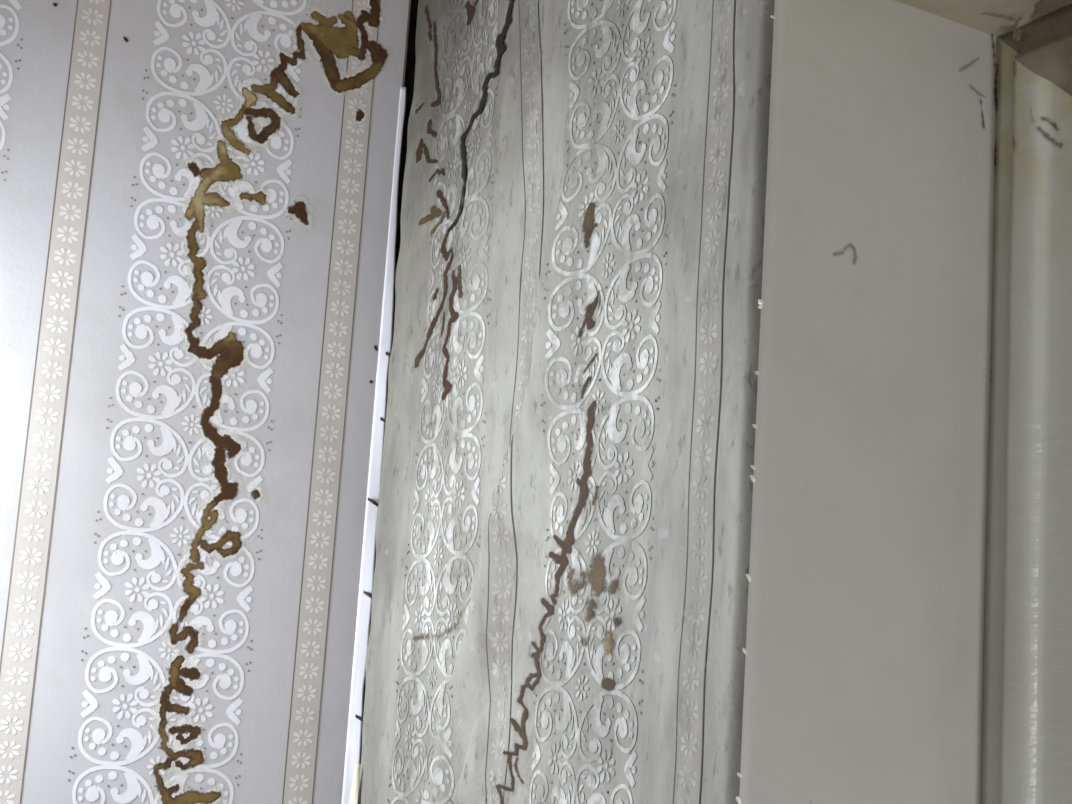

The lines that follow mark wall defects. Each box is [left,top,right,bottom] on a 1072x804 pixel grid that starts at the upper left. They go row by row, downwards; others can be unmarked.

crack [386,0,419,410]
crack [447,0,514,233]
crack [359,676,367,764]